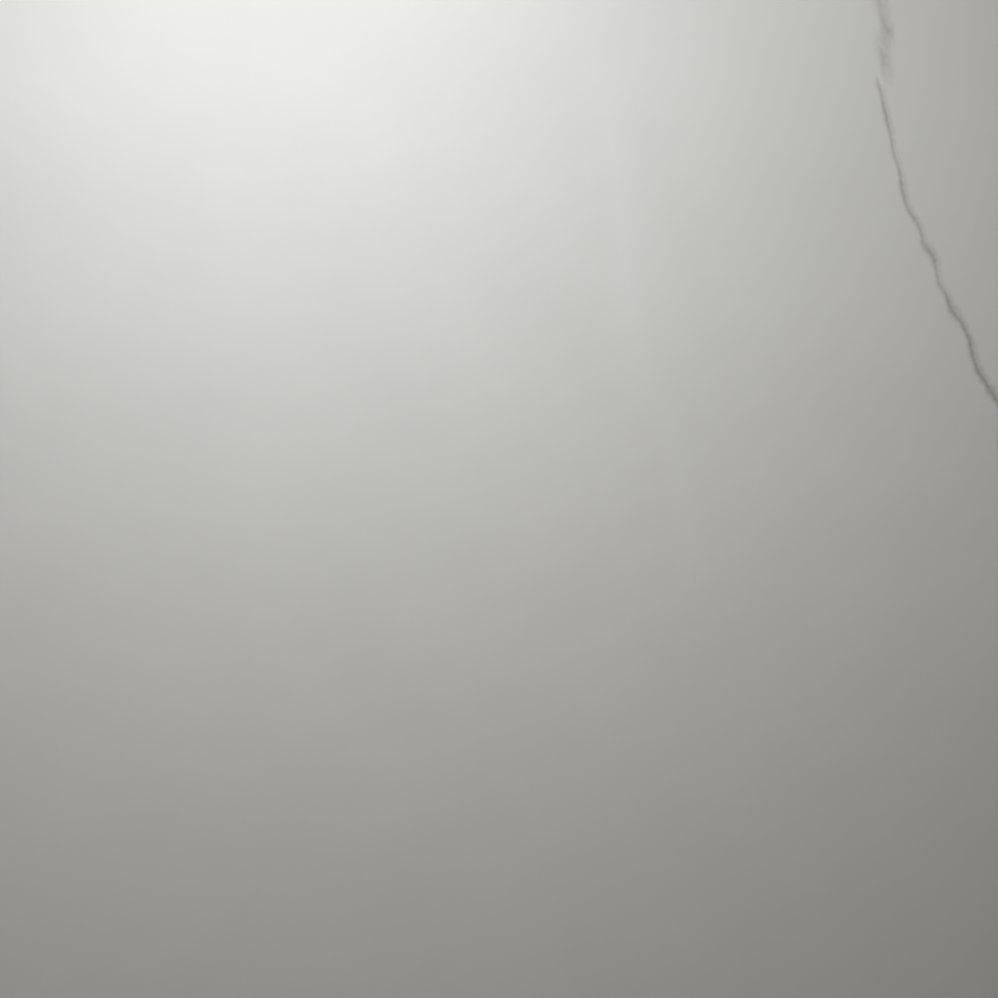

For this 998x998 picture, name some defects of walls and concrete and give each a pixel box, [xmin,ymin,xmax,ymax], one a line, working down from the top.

crack [869,0,998,456]